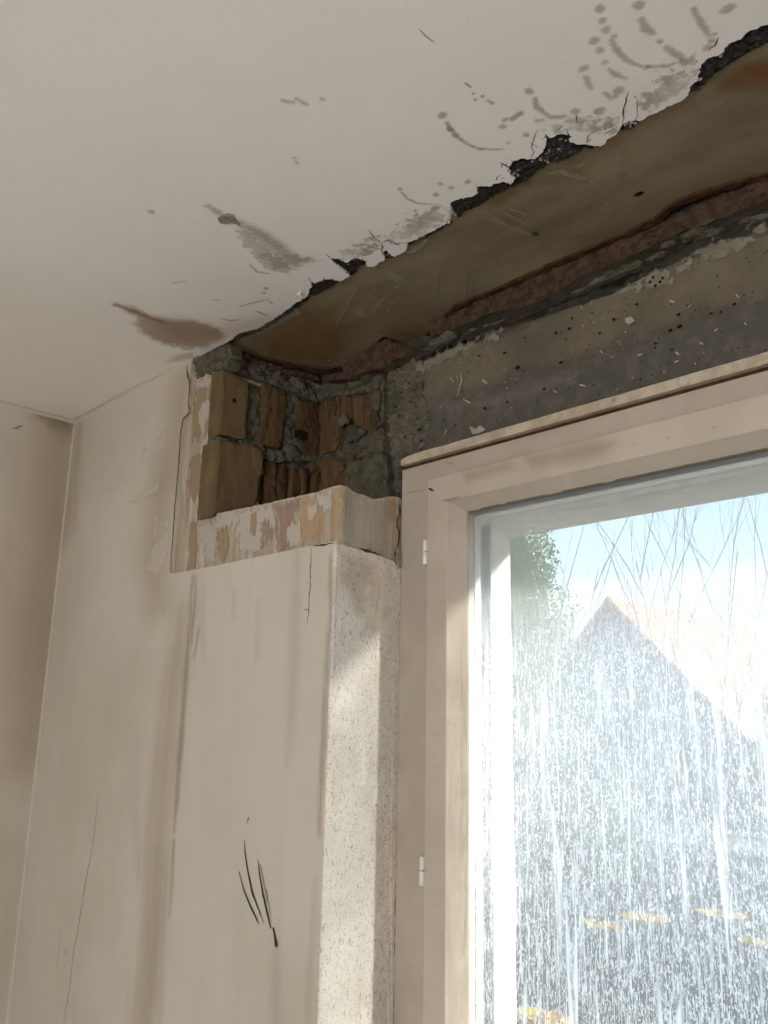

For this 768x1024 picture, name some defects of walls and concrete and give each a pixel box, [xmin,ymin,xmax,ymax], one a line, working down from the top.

spalling [689,25,768,93]
peeling [218,213,240,227]
spalling [369,92,639,261]
spalling [228,255,365,344]
peeling [186,378,342,571]